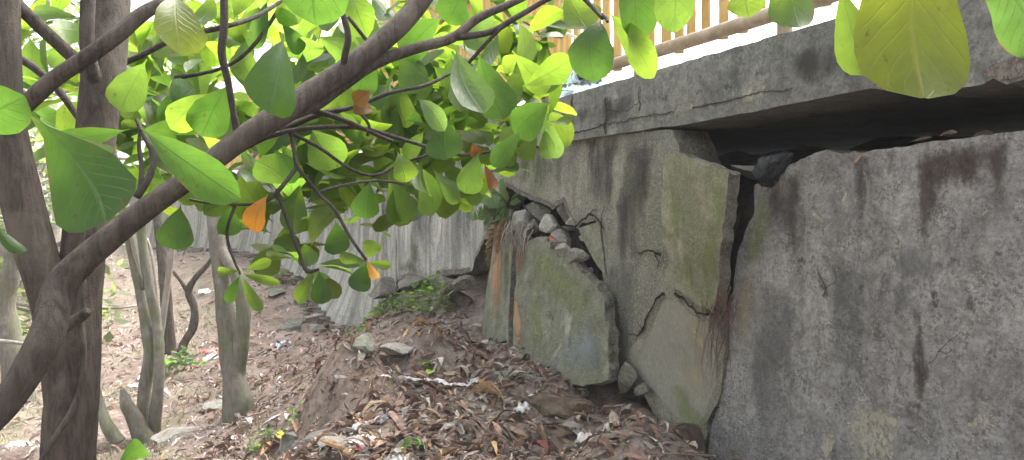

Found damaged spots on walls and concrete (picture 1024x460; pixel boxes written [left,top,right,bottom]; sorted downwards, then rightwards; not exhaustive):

crack [561,86,792,134]
crack [575,209,604,229]
water stain [919,147,1000,235]
rust [491,238,502,307]
crack [628,183,757,339]
rust [513,300,521,341]
water stain [913,316,926,410]